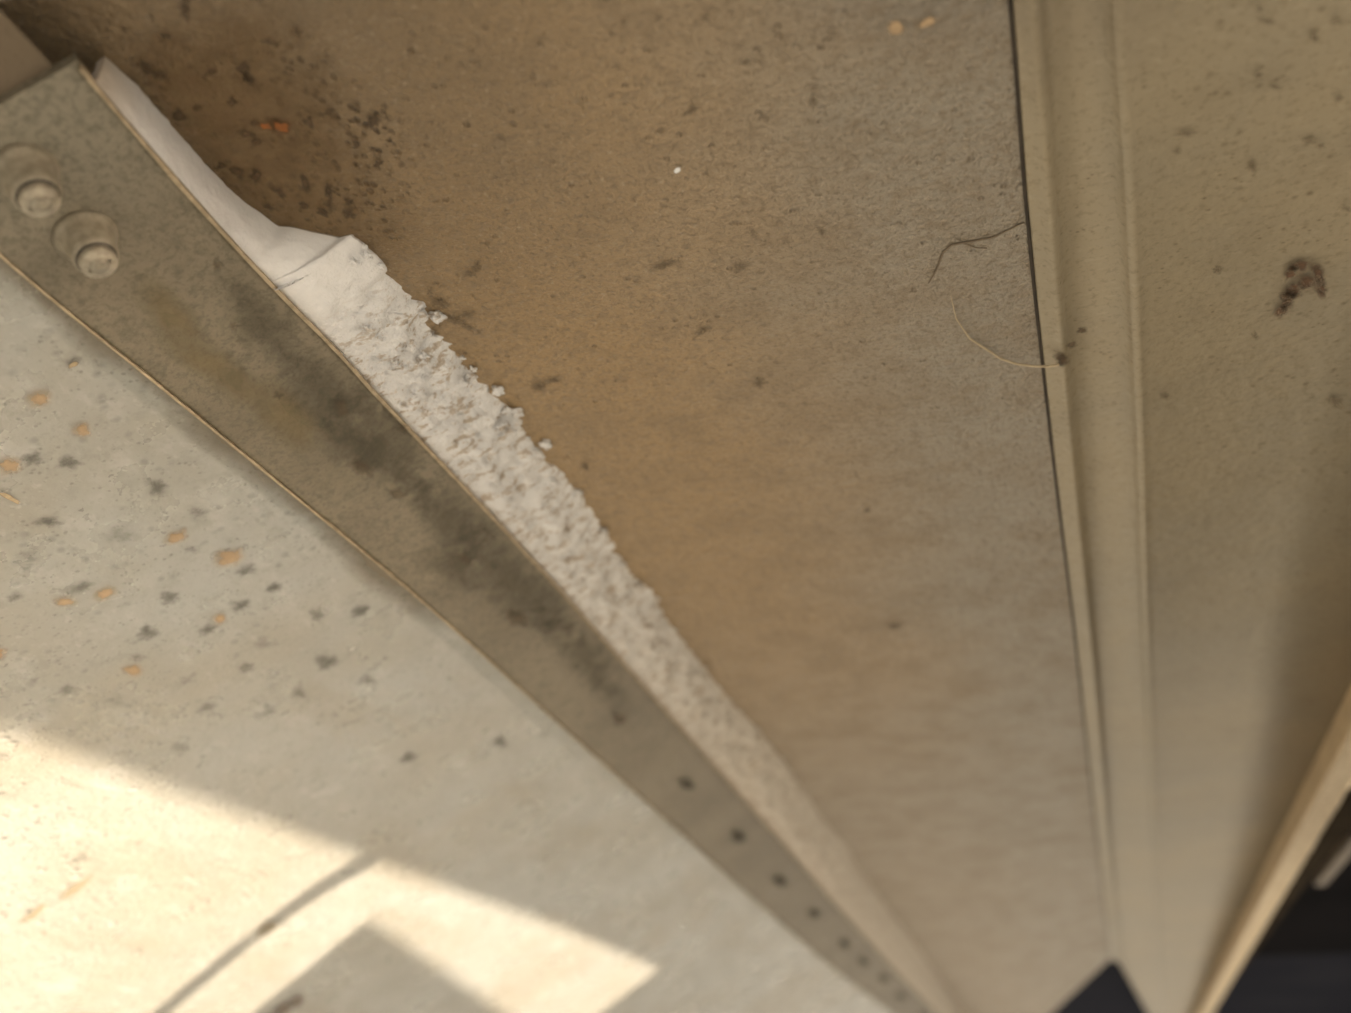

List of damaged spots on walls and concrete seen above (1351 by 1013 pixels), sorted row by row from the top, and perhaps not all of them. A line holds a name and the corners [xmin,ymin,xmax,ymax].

spalling [92,57,963,1013]